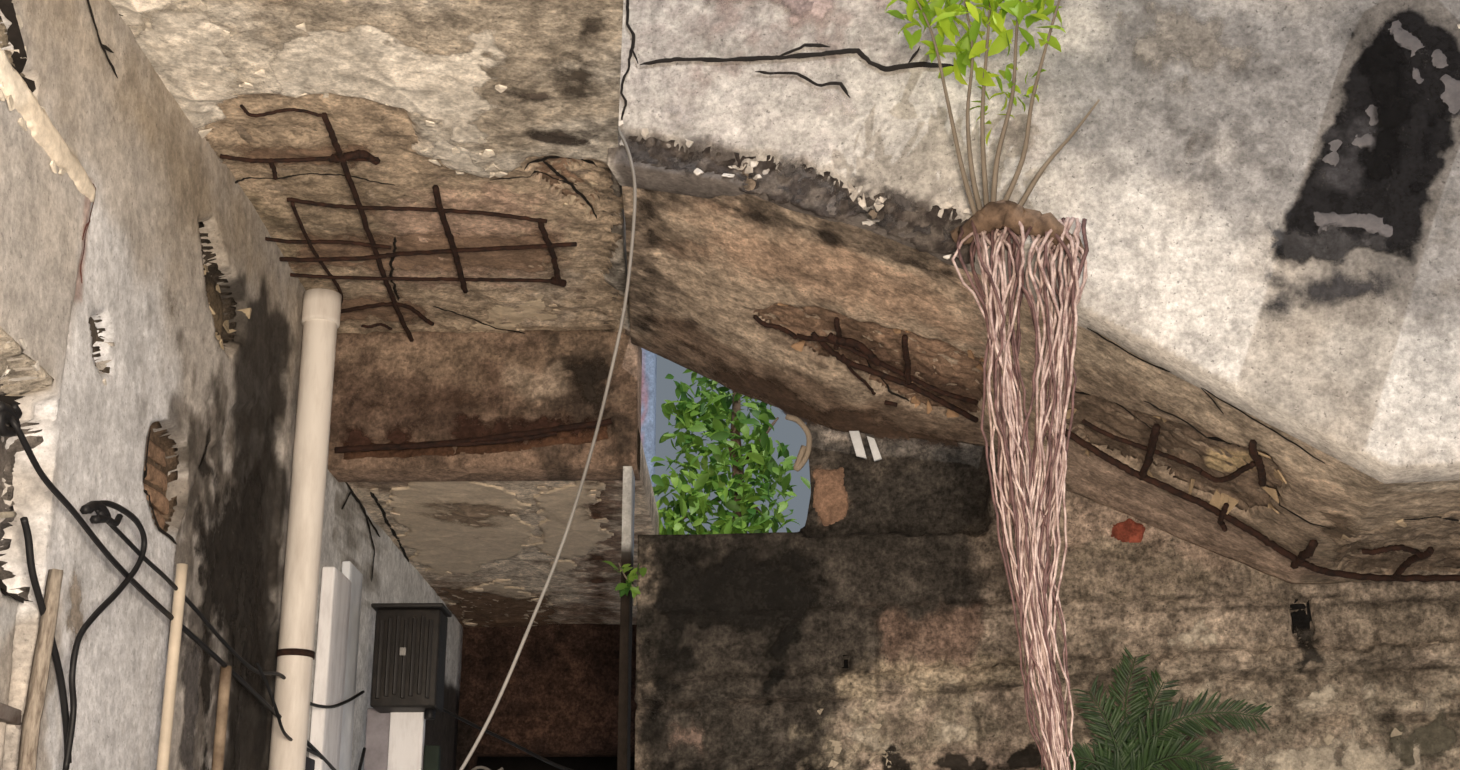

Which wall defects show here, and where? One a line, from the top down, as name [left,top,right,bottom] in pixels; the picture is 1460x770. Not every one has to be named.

spalling [0,0,45,110]
crack [87,0,123,78]
crack [620,0,954,120]
spalling [108,0,628,349]
spalling [619,120,975,264]
damp [1266,10,1460,316]
flaking render [0,422,44,603]
flaking render [143,422,179,544]
damp [180,430,265,770]
damp [651,547,828,716]
damp [801,724,912,770]
damp [933,721,1044,770]